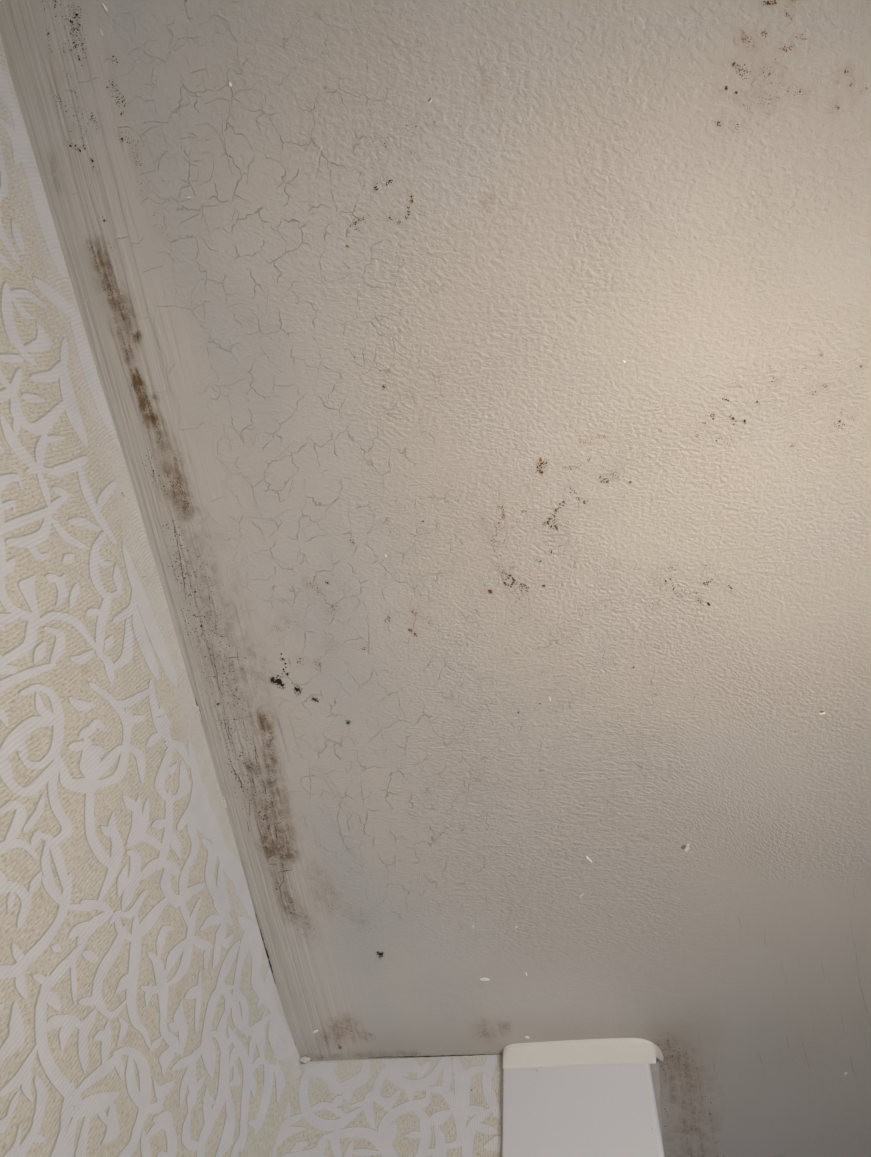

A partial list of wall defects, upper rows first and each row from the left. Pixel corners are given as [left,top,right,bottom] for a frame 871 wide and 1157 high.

crack [113,0,262,273]
damp [90,216,193,510]
crack [175,533,293,903]
damp [163,524,319,935]